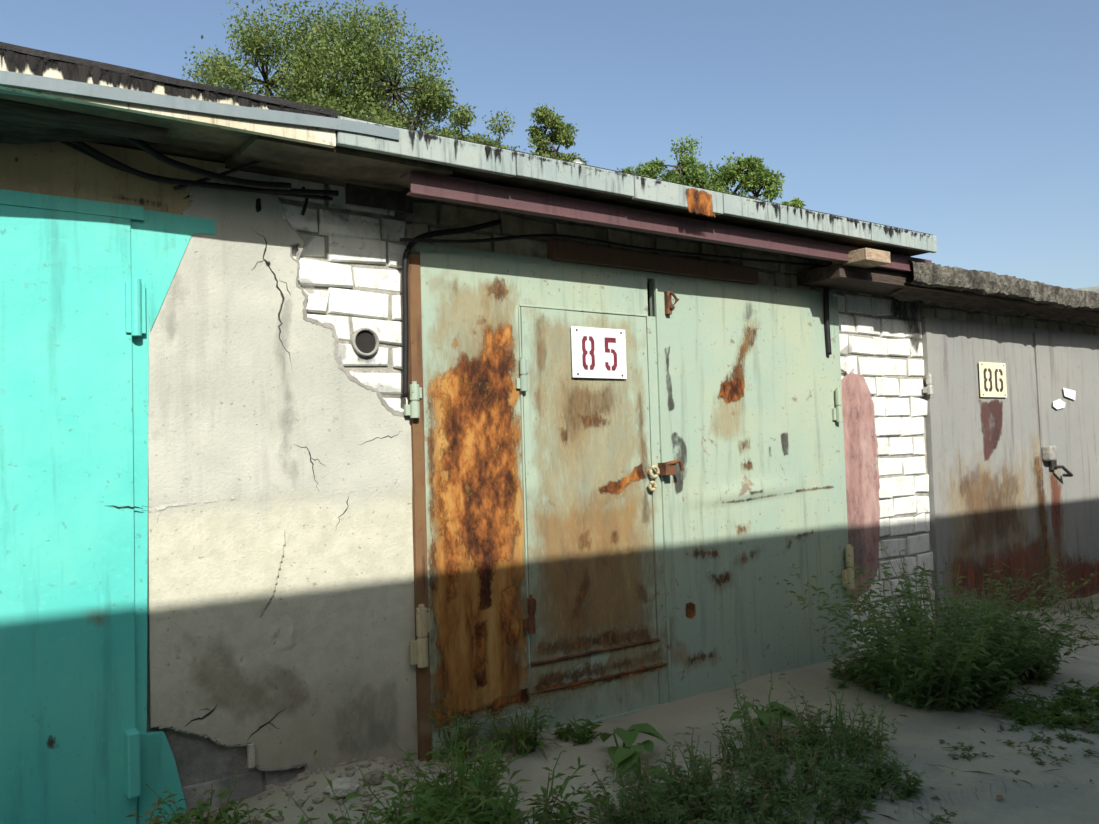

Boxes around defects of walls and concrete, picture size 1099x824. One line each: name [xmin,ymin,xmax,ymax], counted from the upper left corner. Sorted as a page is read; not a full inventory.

leakage [0,48,263,107]
rust [685,188,715,216]
crack [252,231,292,369]
spalling [270,175,416,418]
rust [485,277,508,302]
rust [719,327,756,403]
crack [294,444,325,490]
rust [428,320,662,729]
rust [1034,455,1099,603]
rust [686,602,696,618]